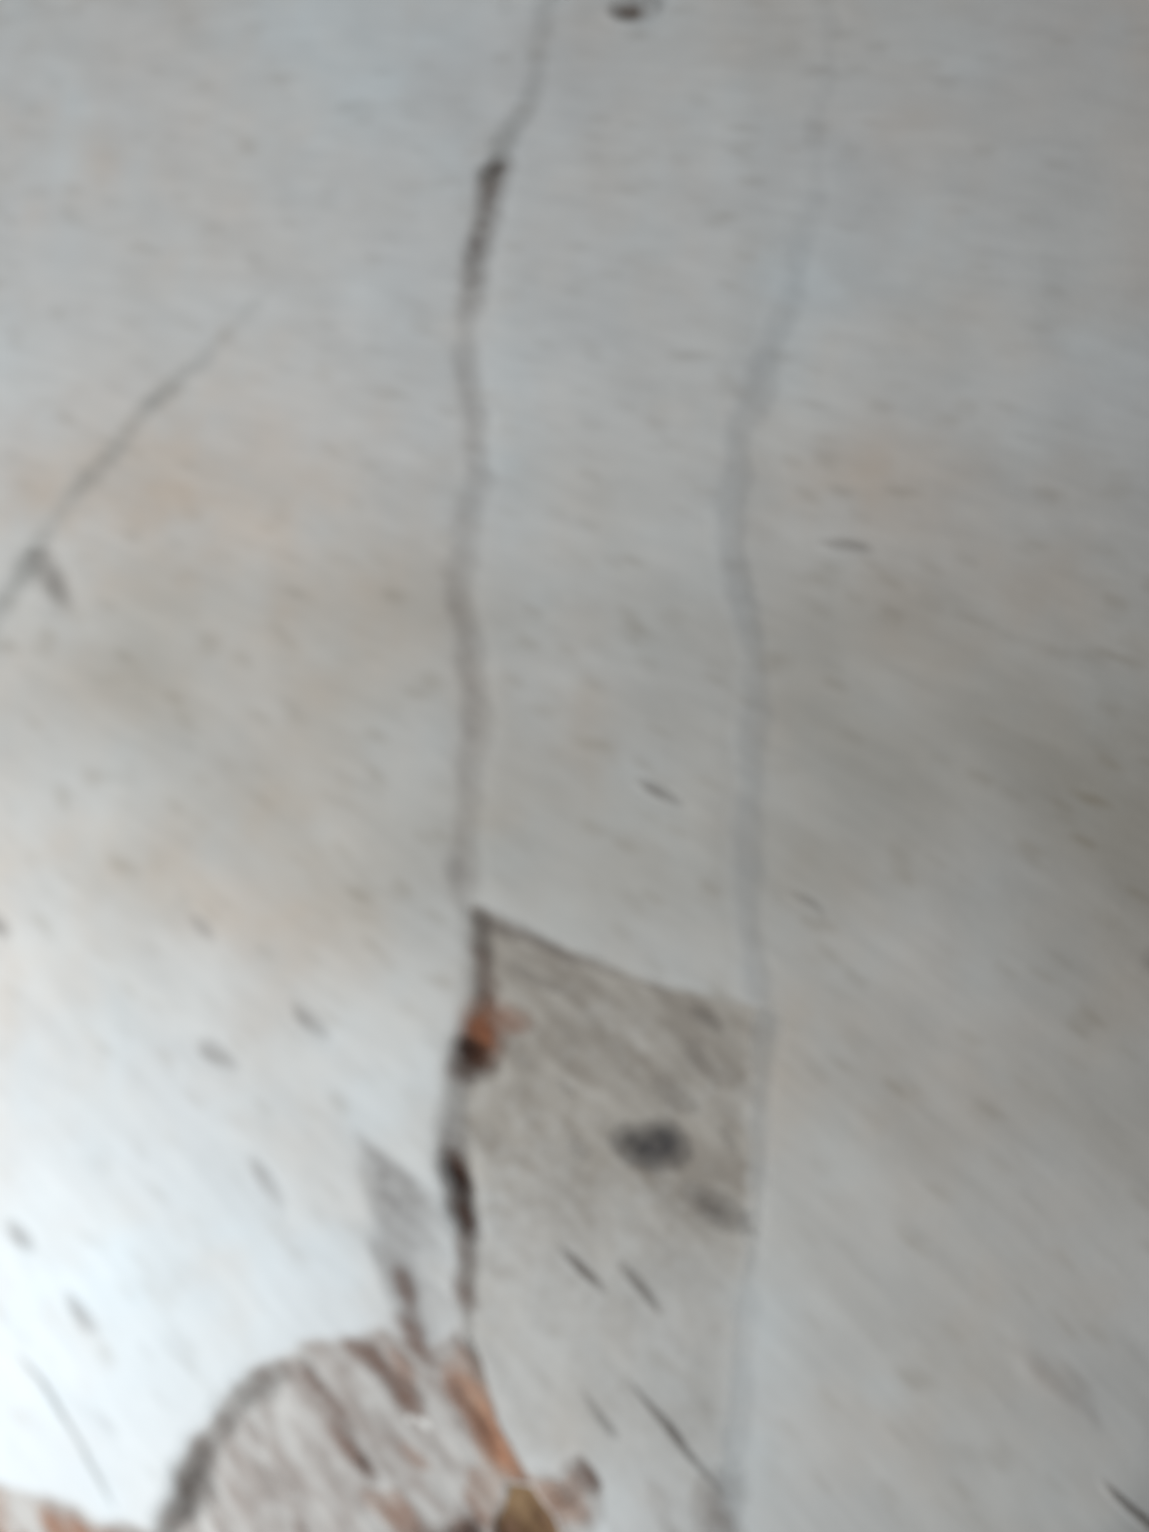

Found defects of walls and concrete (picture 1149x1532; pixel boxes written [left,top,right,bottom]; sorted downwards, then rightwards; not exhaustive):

crack [0,284,277,636]
crack [433,149,519,920]
flaking render [0,902,777,1532]
corrosion [457,1013,505,1074]
crack [15,1350,118,1513]